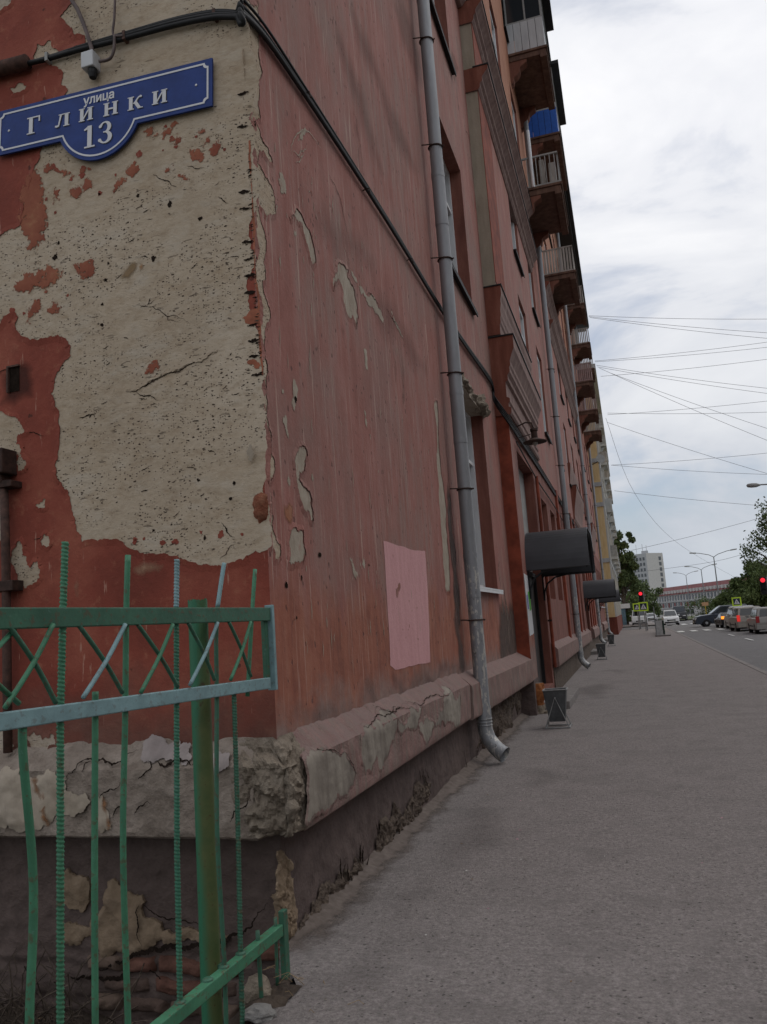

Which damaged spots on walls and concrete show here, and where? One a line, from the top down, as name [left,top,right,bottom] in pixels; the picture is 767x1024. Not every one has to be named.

peeling [0,0,322,593]
peeling [331,258,403,338]
crack [125,348,217,400]
peeling [0,727,57,750]
spalling [0,766,111,833]
crack [66,750,193,815]
peeling [141,734,192,765]
crack [365,689,454,728]
spalling [213,707,431,961]
flaking render [64,868,200,1014]